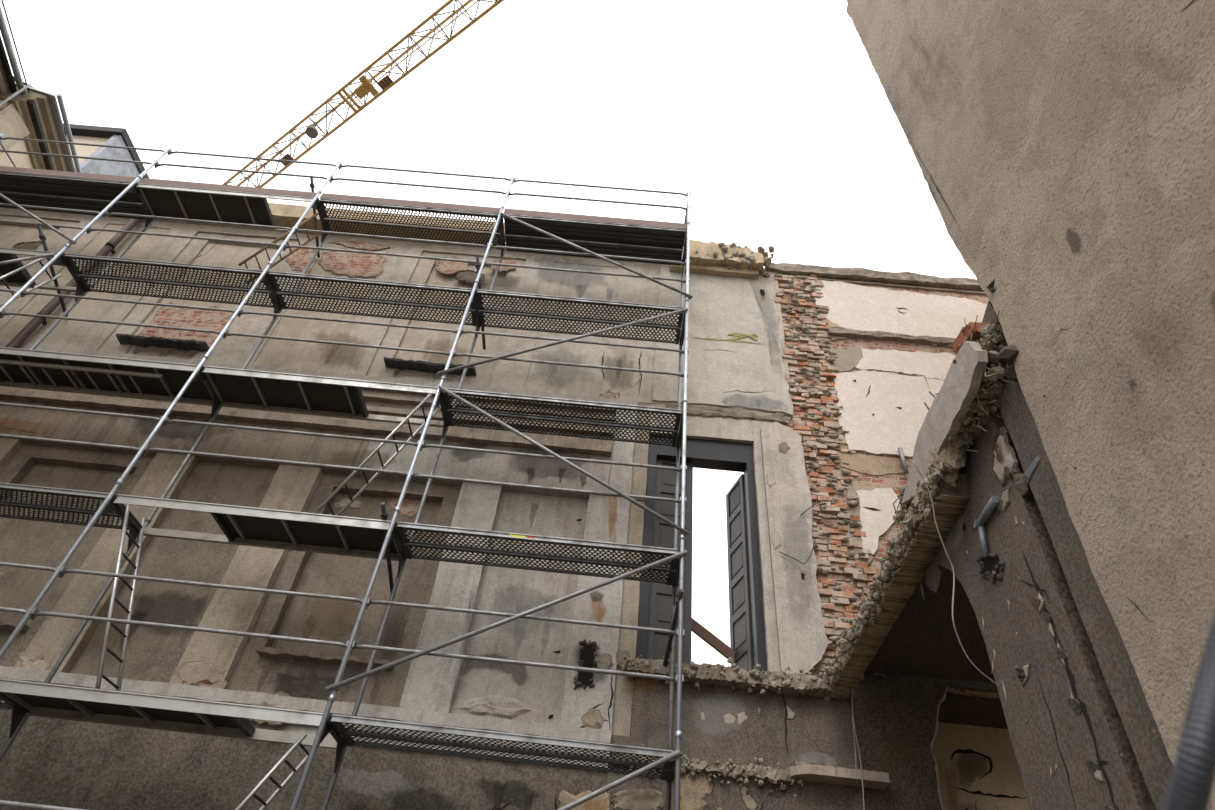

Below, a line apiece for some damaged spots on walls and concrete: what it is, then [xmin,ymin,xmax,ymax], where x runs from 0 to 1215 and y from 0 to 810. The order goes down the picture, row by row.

flaking render [285,240,390,278]
flaking render [137,302,234,348]
flaking render [817,324,863,382]
flaking render [825,392,912,565]
spalling [991,426,1025,525]
spalling [573,639,631,690]
crack [1021,551,1119,810]
peeling [581,708,609,729]
peeling [724,708,760,725]
spalling [558,784,665,810]
spalling [680,771,727,810]
crack [951,749,1026,810]